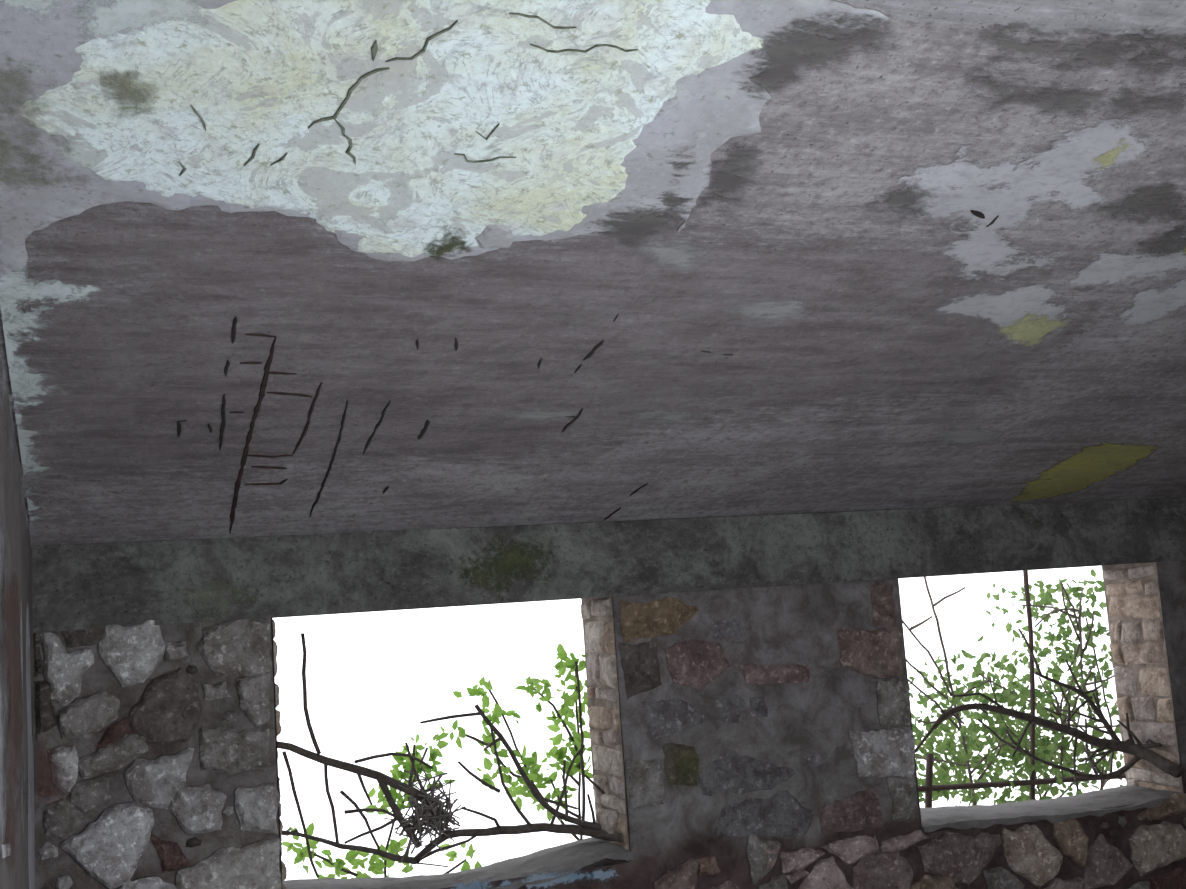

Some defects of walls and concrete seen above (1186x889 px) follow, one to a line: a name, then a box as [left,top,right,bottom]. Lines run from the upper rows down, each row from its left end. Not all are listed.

crack [509,13,638,53]
crack [191,106,206,131]
crack [244,144,288,166]
crack [308,20,458,165]
crack [454,123,516,163]
damp [965,24,1186,118]
peeling [0,0,890,406]
damp [1089,183,1186,256]
peeling [998,314,1068,346]
crack [177,316,323,534]
crack [310,401,391,516]
peeling [1011,443,1158,502]